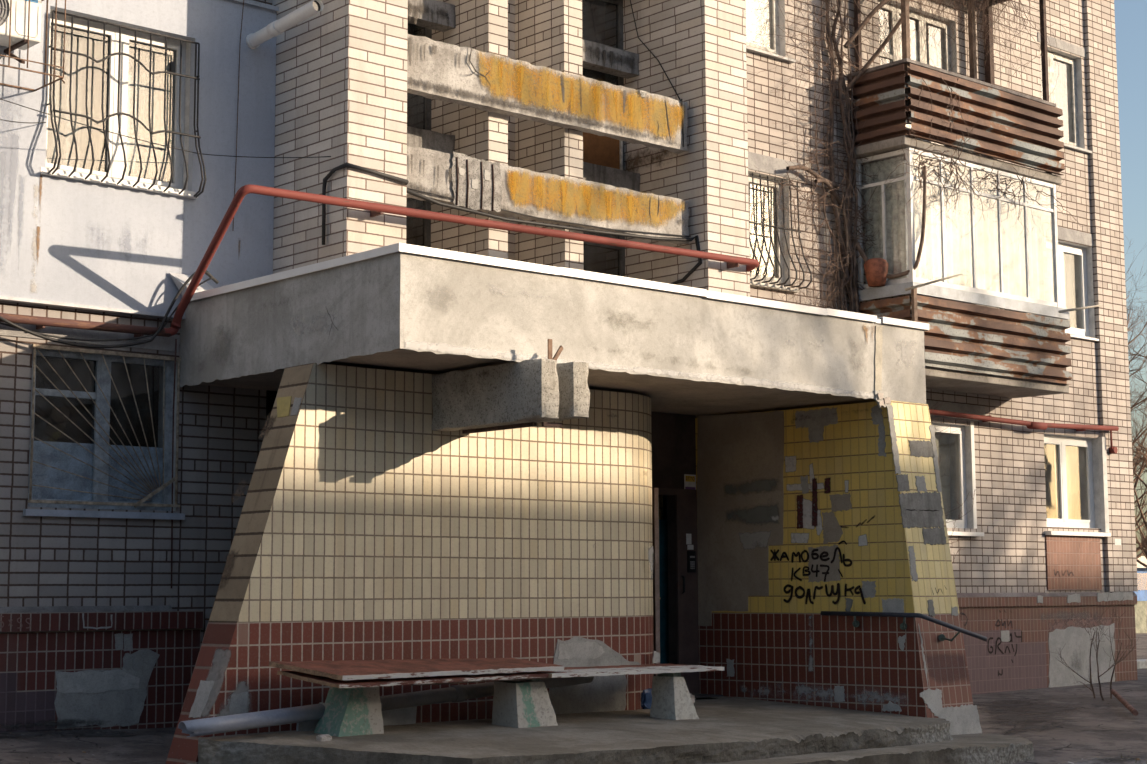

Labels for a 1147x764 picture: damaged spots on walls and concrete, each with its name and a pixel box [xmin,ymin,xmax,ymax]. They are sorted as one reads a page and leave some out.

leakage [0,95,38,236]
spalling [451,151,503,212]
peeling [871,390,946,582]
peeling [56,670,140,694]
peeling [189,680,214,718]